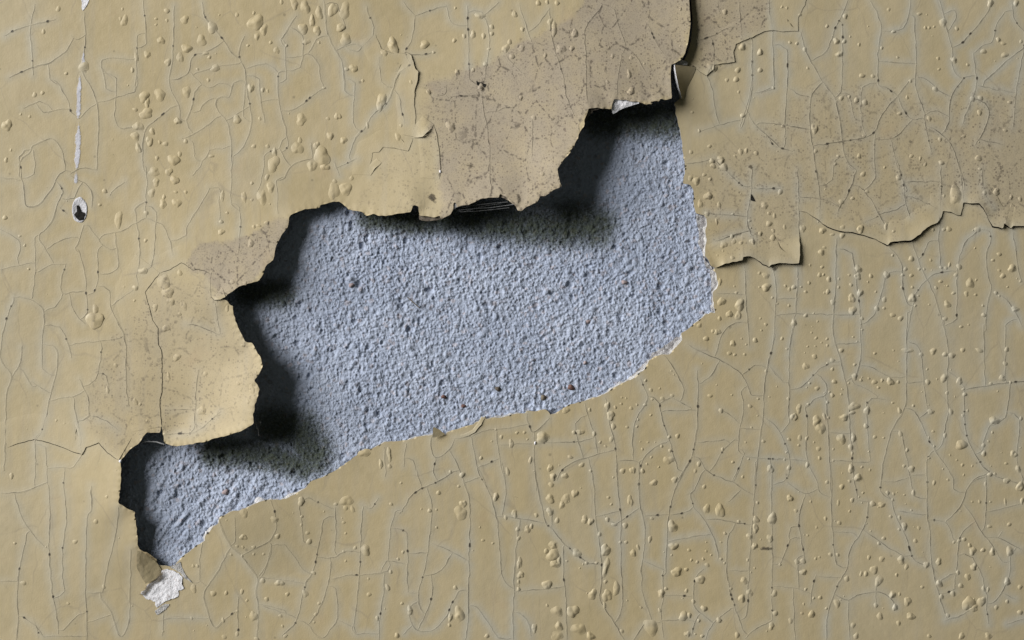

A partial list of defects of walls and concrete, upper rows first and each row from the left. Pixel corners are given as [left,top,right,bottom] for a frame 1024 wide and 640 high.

crack [0,0,665,640]
peeling [118,0,806,615]
crack [162,229,1024,640]
crack [685,0,1024,391]